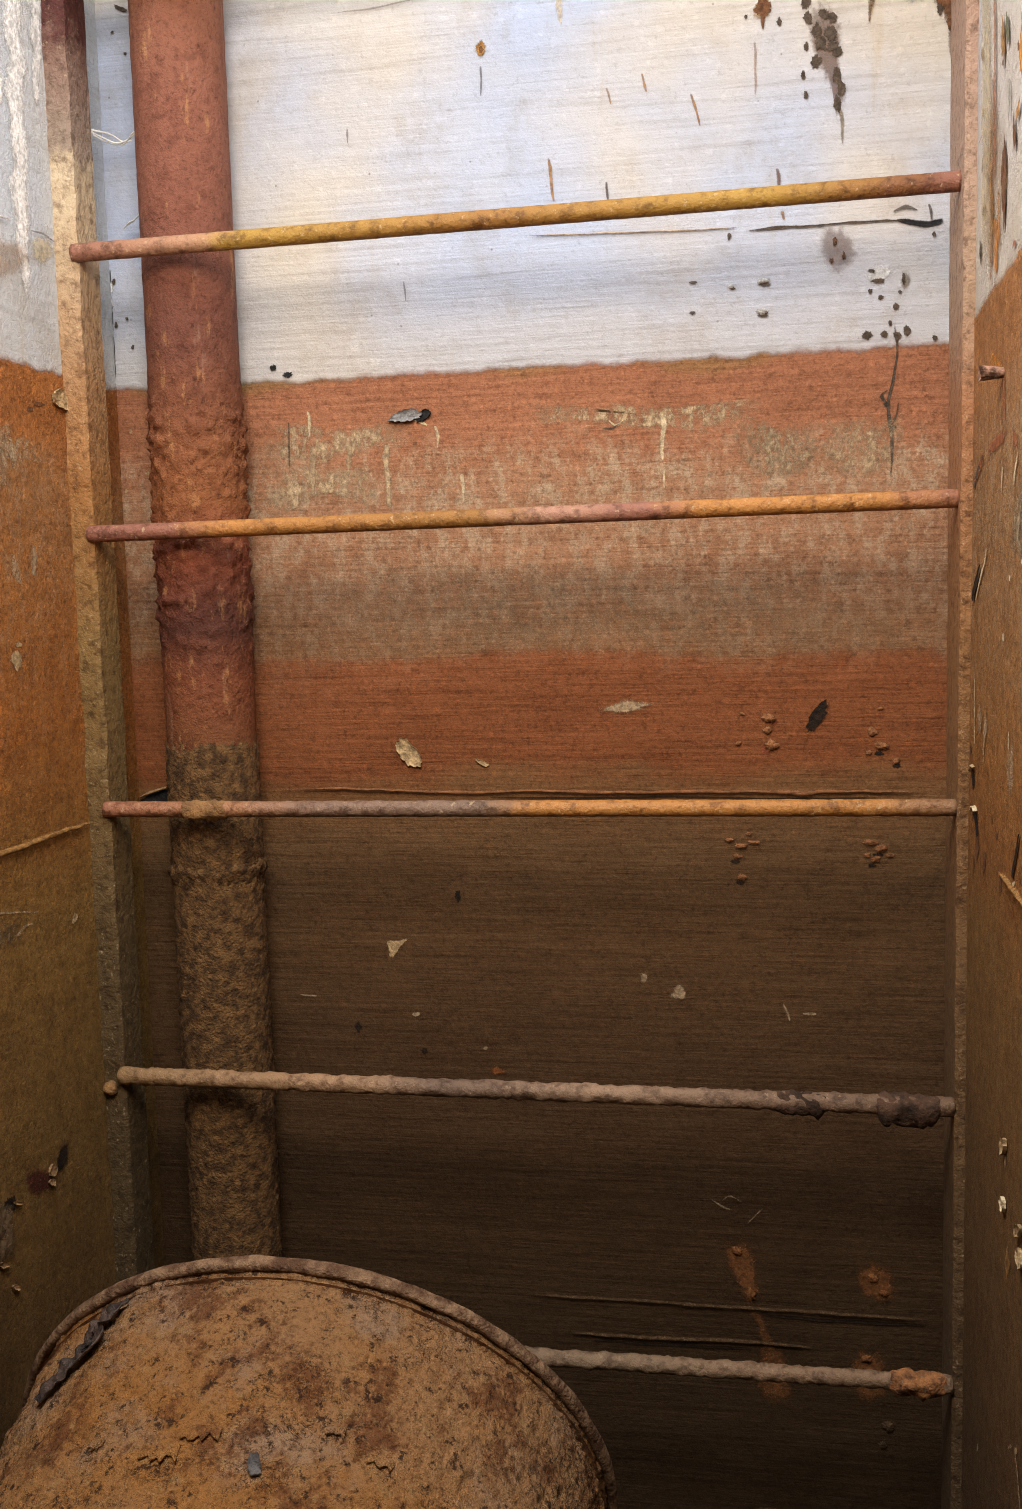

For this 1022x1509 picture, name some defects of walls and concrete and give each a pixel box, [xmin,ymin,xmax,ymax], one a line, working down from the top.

corrosion [989,0,1016,280]
damp [106,388,193,1268]
damp [241,266,949,1509]
spalling [0,1143,69,1269]
corrosion [727,1244,784,1364]
corrosion [858,1263,897,1300]